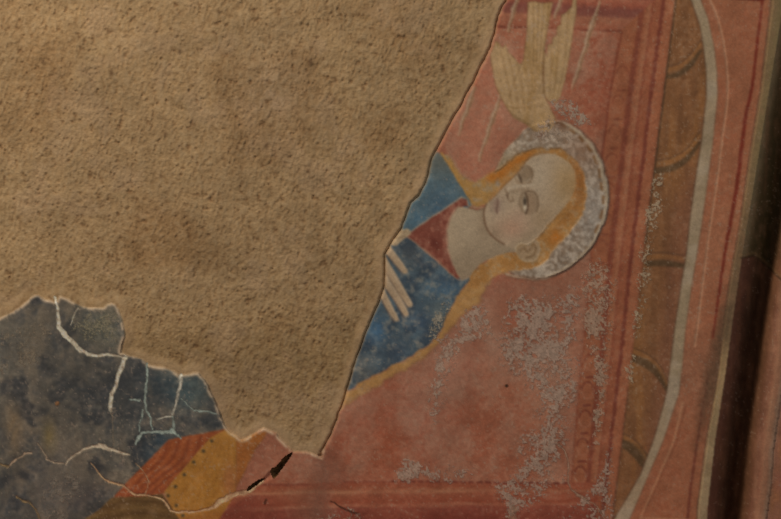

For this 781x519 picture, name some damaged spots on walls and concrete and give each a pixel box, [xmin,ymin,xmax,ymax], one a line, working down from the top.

flaking render [0,0,507,491]
crack [0,296,217,468]
crack [97,471,263,513]